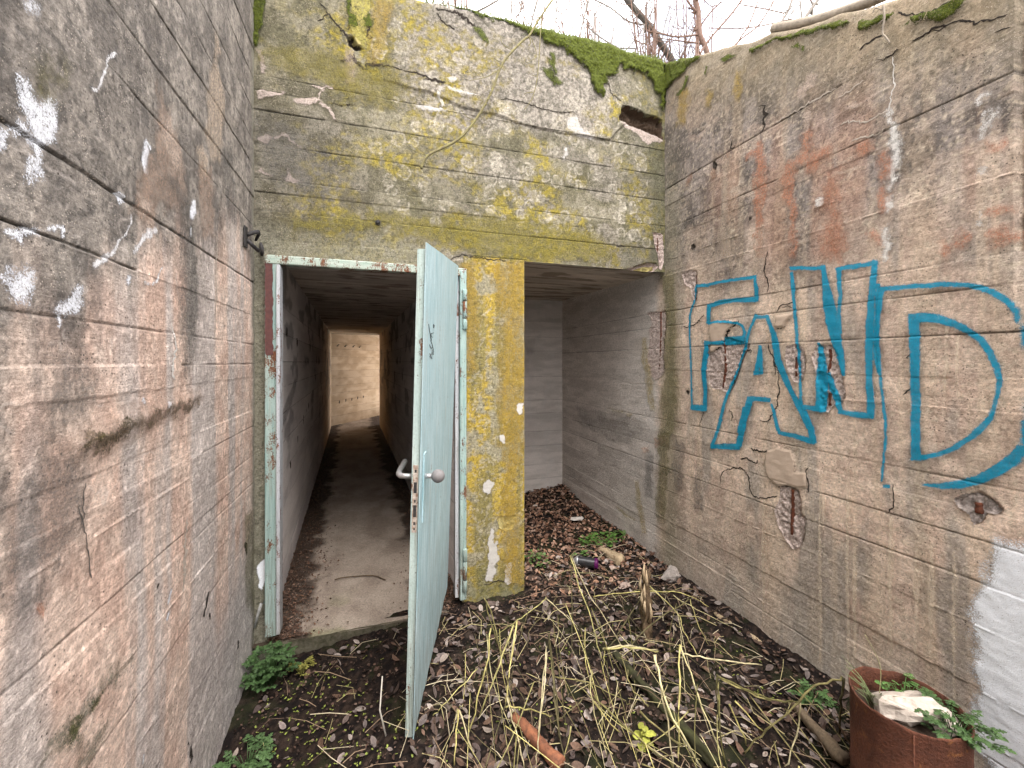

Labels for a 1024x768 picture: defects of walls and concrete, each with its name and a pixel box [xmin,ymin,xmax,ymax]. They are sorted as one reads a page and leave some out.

crack [318,3,446,83]
crack [759,1,1010,142]
spalling [619,106,663,140]
damp [881,108,903,262]
spalling [706,336,749,392]
spalling [784,344,845,413]
crack [78,483,92,578]
peeling [485,516,516,585]
damp [616,431,684,533]
crack [720,448,809,499]
spalling [774,486,806,549]
spalling [954,492,1003,525]